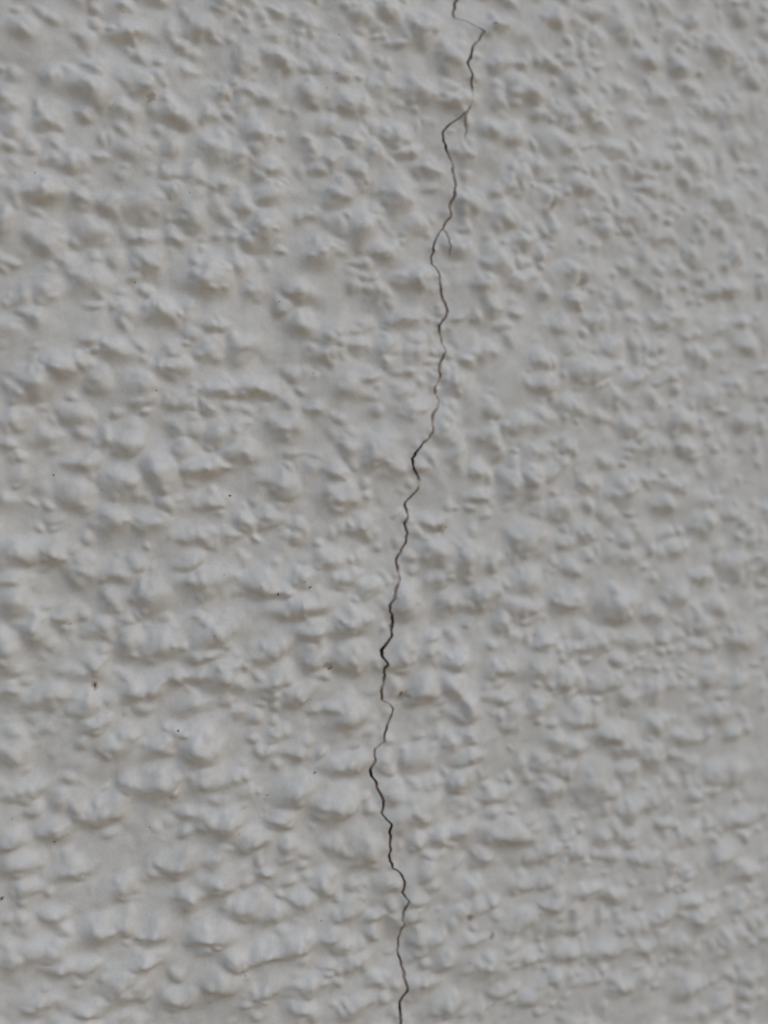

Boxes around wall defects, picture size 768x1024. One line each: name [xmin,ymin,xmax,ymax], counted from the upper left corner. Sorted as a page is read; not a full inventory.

crack [369,0,485,1024]